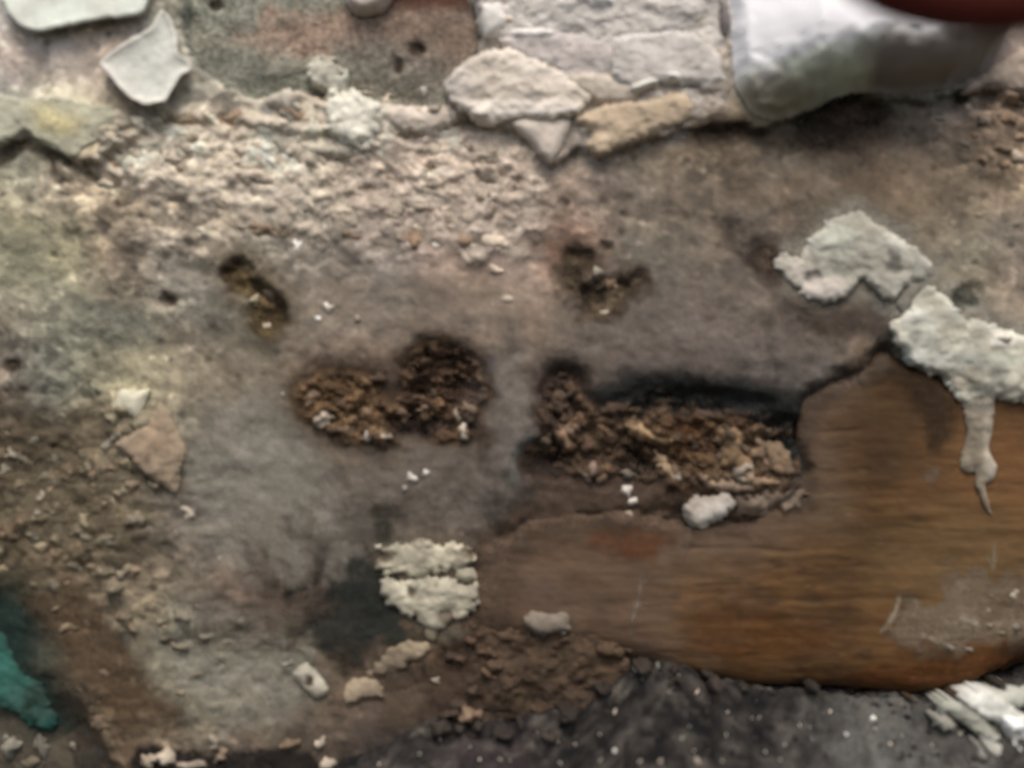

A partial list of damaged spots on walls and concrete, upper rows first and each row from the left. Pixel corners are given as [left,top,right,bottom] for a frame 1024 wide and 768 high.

flaking render [0,0,733,274]
hole [221,254,290,339]
hole [558,247,652,322]
hole [289,330,496,457]
hole [516,366,802,499]
damp [155,402,430,727]